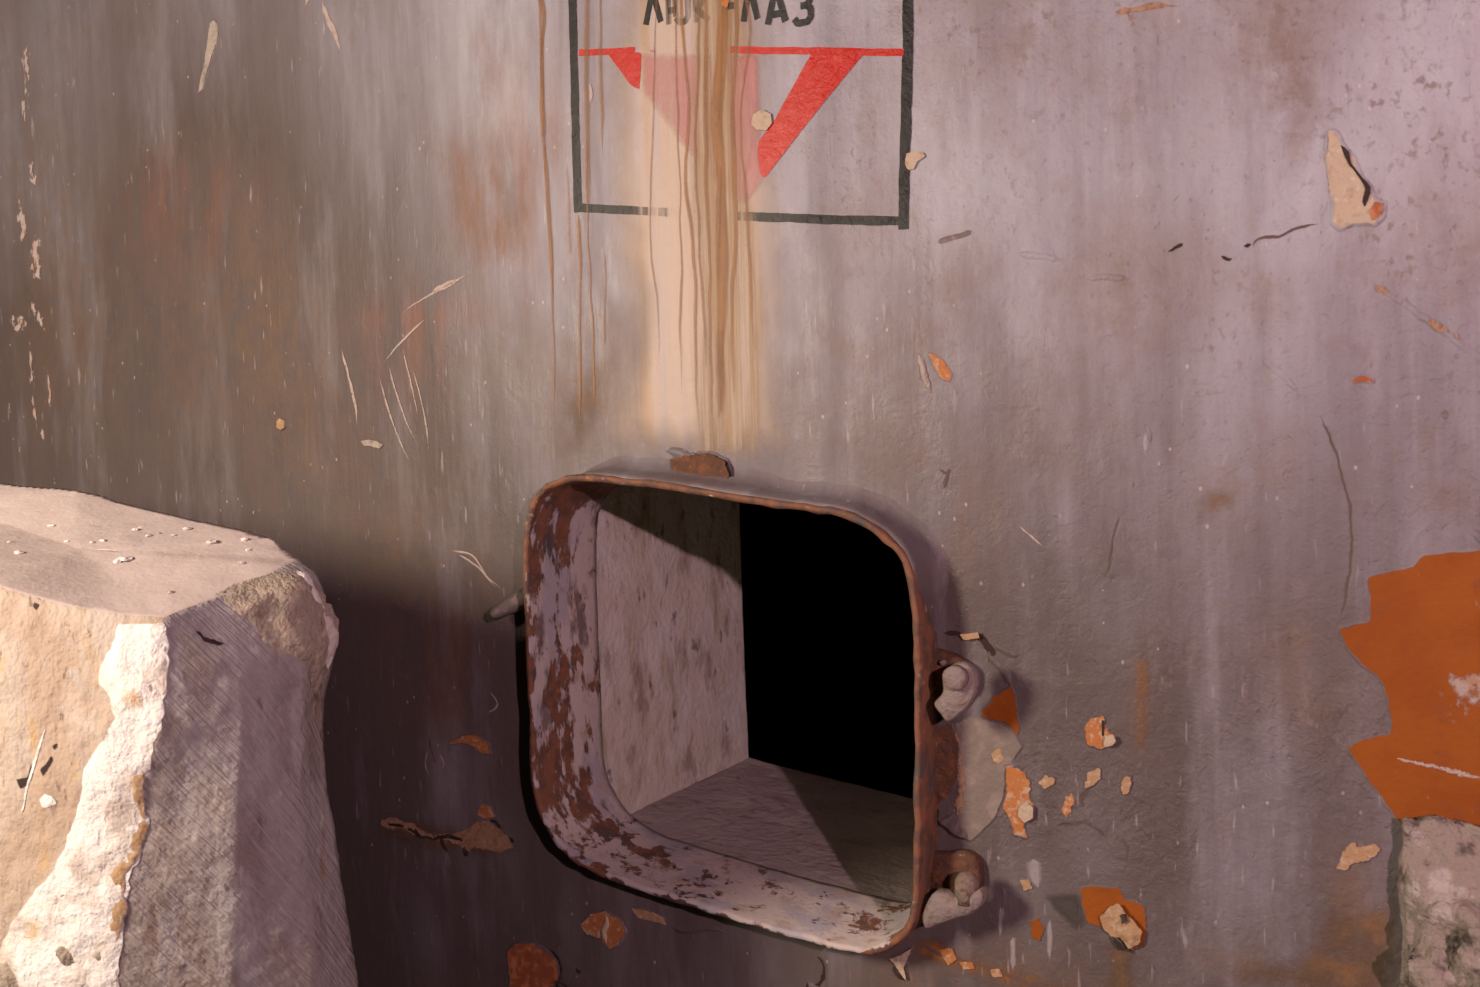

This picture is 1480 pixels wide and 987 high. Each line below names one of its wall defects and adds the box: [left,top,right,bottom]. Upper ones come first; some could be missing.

rust [538,0,554,355]
rust [577,0,603,421]
rust [665,0,757,478]
spalling [1323,128,1388,232]
spalling [217,571,339,701]
peeling [1337,548,1480,827]
rust [936,723,960,804]
flaking render [954,685,1117,842]
peeling [1120,774,1134,795]
peeling [506,941,560,987]
peeling [1029,916,1046,942]
peeling [1080,885,1148,951]